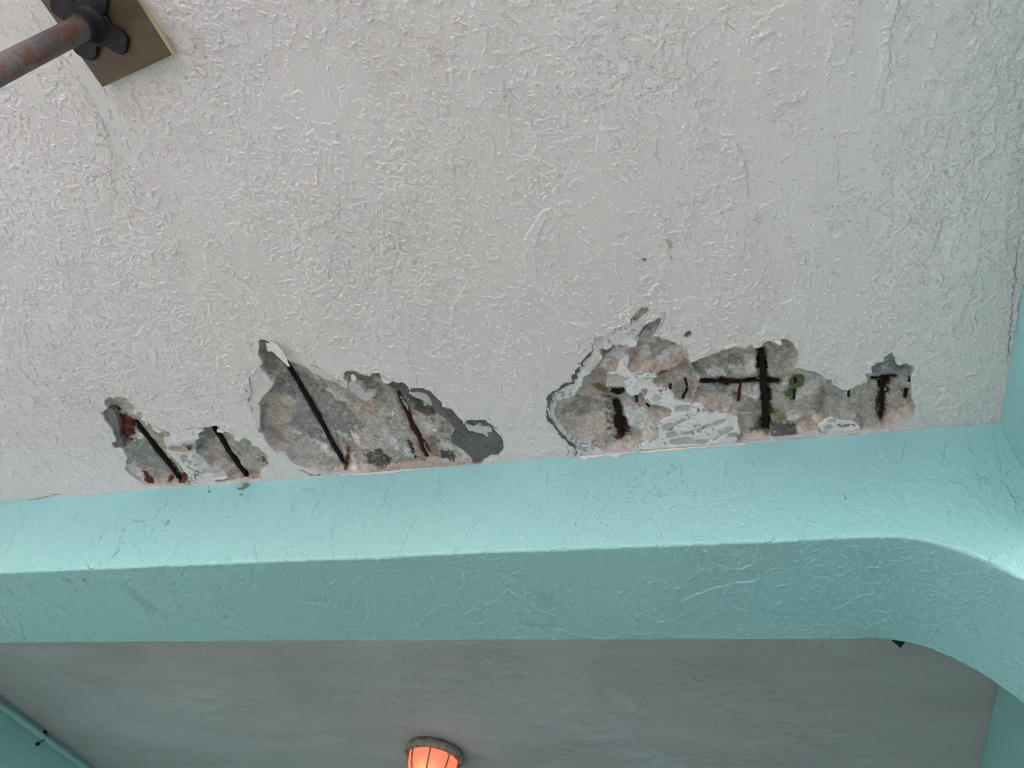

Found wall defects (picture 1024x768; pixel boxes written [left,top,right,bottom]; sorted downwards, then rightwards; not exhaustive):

spalling [103,339,504,487]
spalling [549,307,916,460]